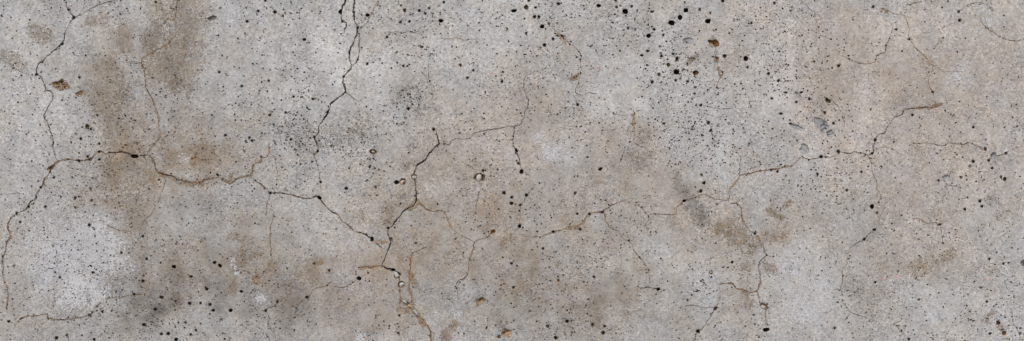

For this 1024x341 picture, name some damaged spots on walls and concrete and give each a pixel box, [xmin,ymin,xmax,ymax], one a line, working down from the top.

crack [2,0,663,339]
crack [642,1,1023,336]